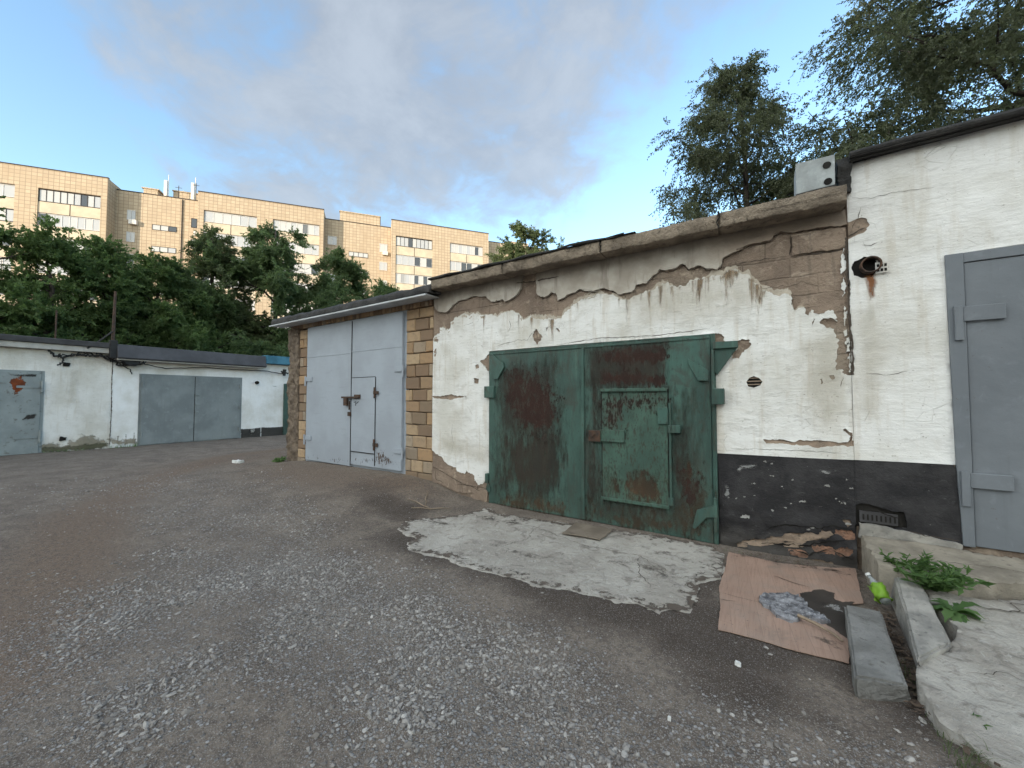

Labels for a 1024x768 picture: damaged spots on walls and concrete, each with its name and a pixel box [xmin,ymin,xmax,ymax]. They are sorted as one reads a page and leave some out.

peeling [434,209,870,384]
corrosion [866,276,876,296]
flaking render [433,451,489,502]
corrosion [498,364,567,444]
corrosion [587,343,670,435]
corrosion [585,397,716,540]
spalling [764,433,854,448]